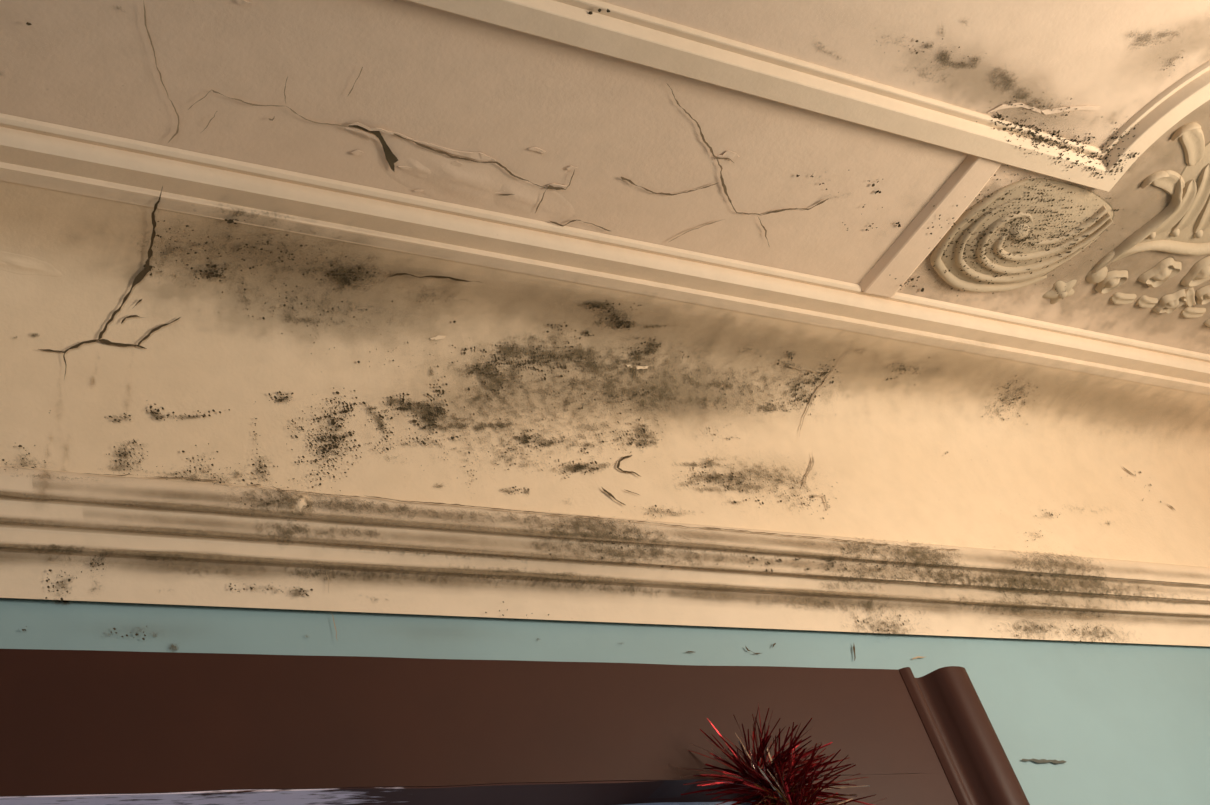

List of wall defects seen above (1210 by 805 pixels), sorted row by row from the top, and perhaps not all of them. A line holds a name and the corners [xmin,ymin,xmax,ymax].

crack [144,5,349,143]
water stain [876,32,978,69]
crack [395,134,610,231]
crack [621,84,829,245]
water stain [895,72,1167,299]
crack [38,186,181,377]
water stain [143,211,377,334]
water stain [0,300,1210,643]